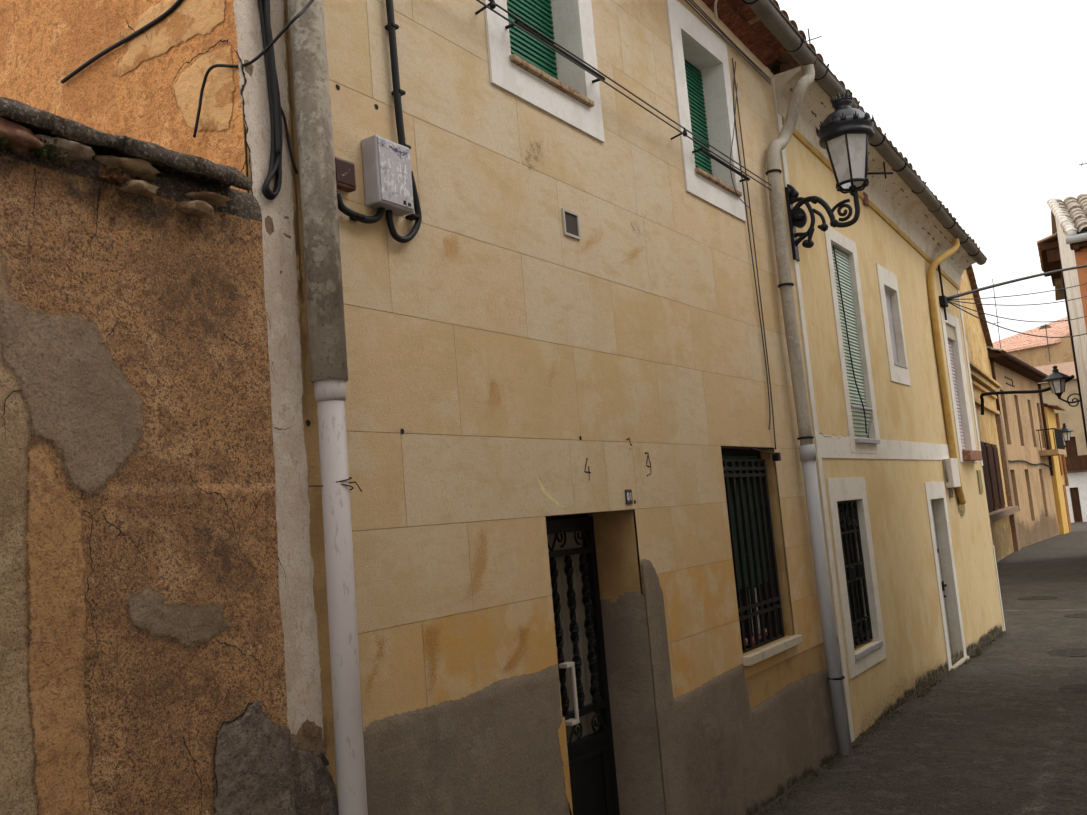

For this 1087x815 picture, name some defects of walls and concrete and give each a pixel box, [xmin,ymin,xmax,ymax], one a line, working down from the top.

spalling [111,0,226,77]
spalling [174,44,254,132]
spalling [204,700,339,815]